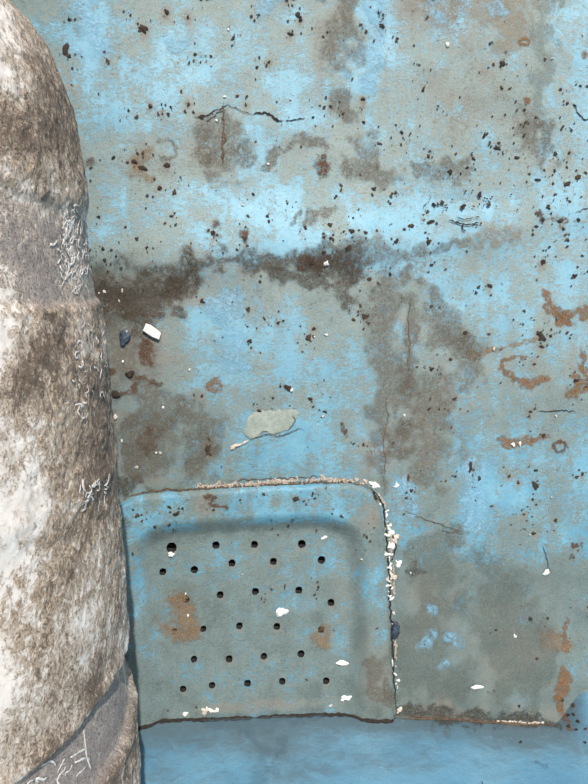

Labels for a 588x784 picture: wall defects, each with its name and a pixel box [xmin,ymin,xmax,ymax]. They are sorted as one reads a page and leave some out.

crack [194,103,304,163]
corrosion [542,289,588,327]
water stain [93,225,521,496]
corrosion [462,338,550,389]
corrosion [565,352,588,398]
peeling [230,408,302,450]
crack [118,408,559,730]
water stain [382,525,561,730]
corrosion [553,667,572,731]